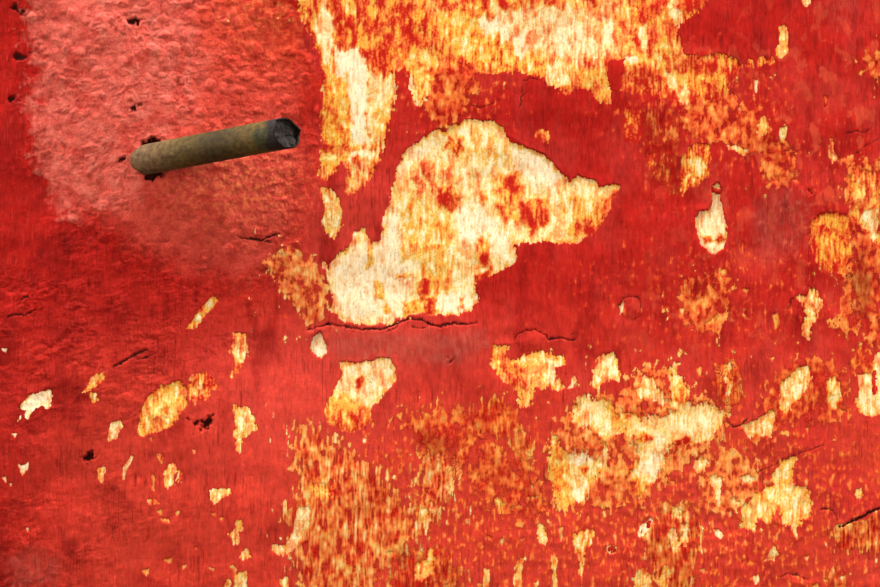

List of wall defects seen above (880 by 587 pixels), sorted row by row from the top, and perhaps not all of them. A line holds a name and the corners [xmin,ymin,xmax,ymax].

peeling [259,0,798,358]
crack [307,318,477,332]
peeling [272,138,880,587]
peeling [17,389,53,422]
peeling [137,372,217,441]